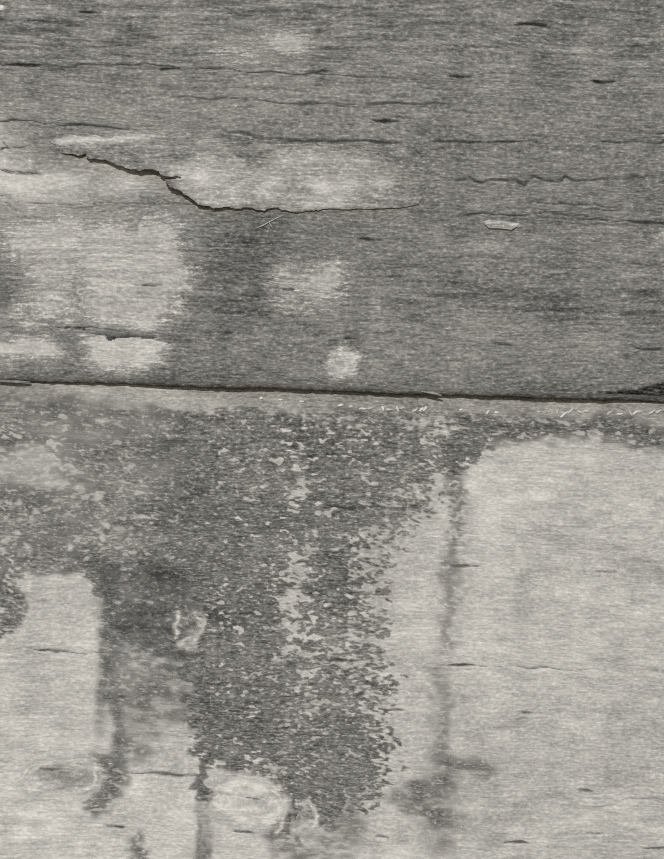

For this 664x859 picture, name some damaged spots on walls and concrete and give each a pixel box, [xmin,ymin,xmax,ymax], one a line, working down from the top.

peeling [50,127,430,212]
peeling [483,219,519,230]
crack [455,176,664,224]
damp [0,392,664,859]